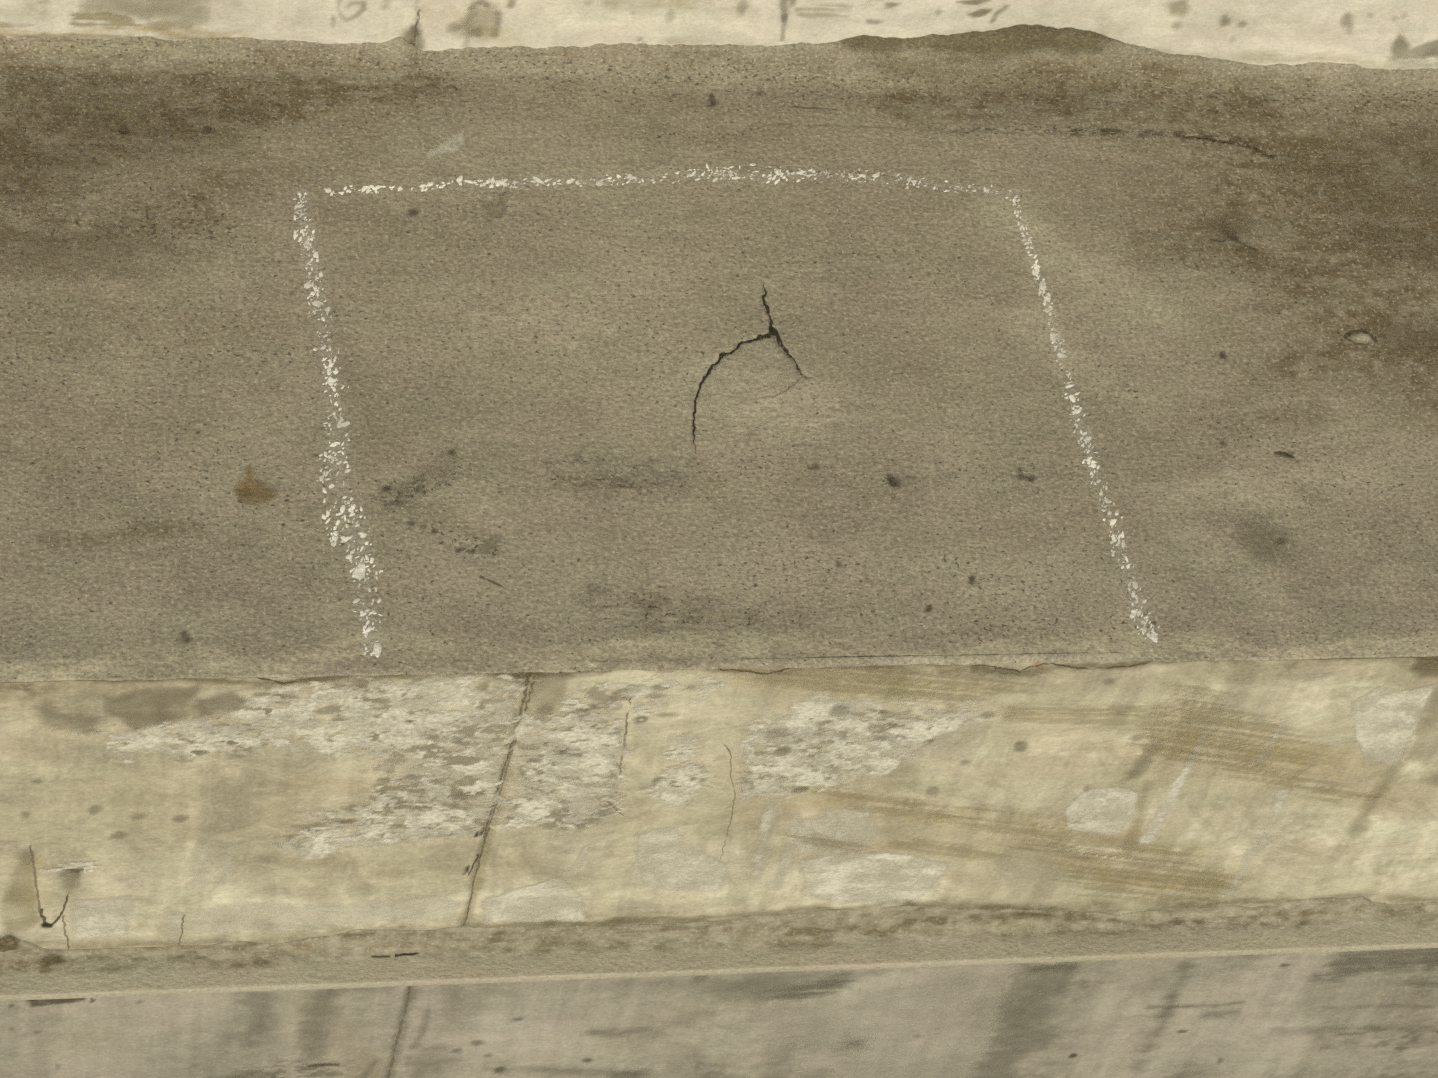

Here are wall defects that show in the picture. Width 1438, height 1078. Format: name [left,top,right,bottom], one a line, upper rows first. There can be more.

crack [692,284,803,456]
crack [464,673,536,924]